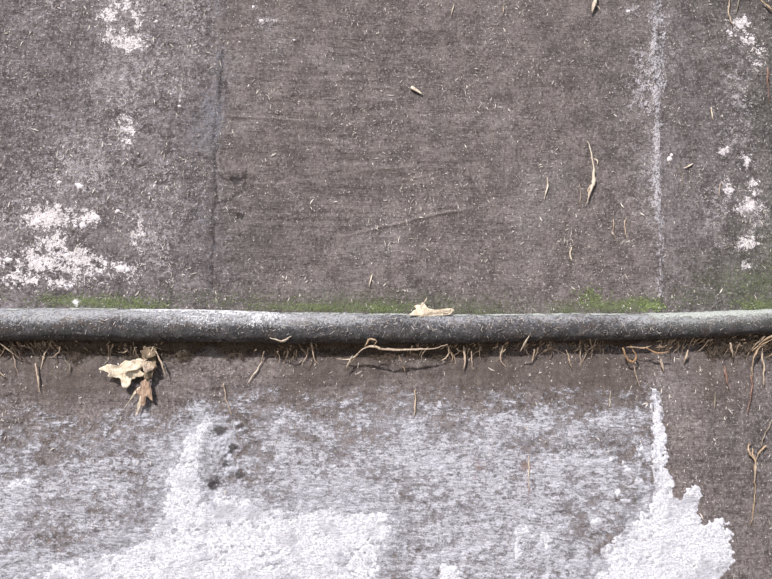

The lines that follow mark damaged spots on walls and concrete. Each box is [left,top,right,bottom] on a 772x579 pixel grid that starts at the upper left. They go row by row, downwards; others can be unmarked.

water stain [0,0,225,292]
water stain [252,1,296,51]
water stain [612,0,683,295]
water stain [699,14,772,273]
water stain [70,298,419,327]